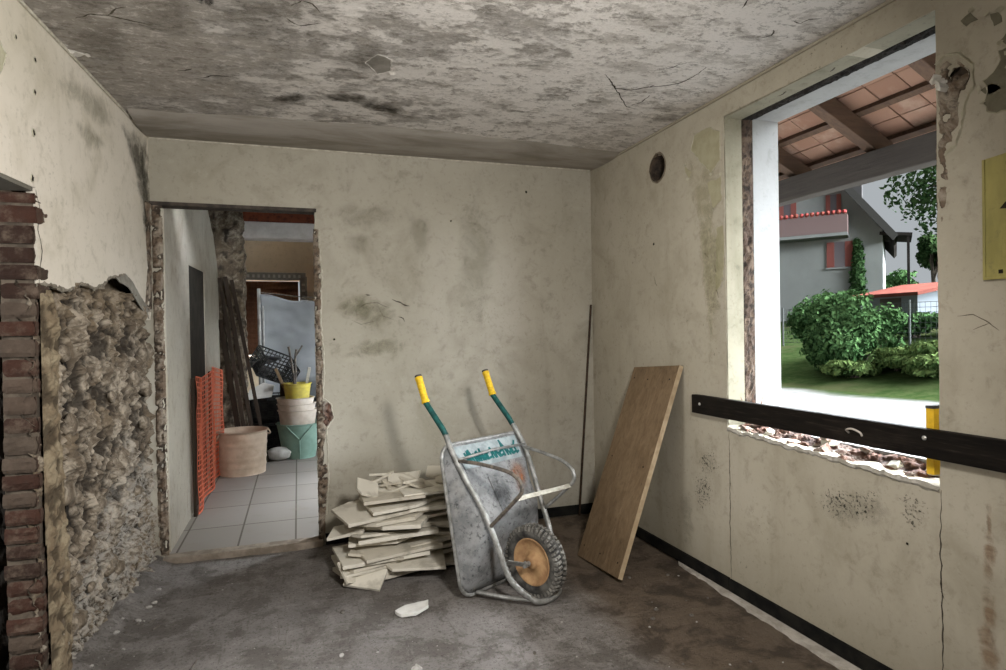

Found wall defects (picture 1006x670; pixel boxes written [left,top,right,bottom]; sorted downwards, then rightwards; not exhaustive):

damp [327,94,396,113]
spalling [741,26,935,404]
spalling [929,34,1006,221]
peeling [961,5,1004,26]
spalling [0,357,9,670]
spalling [15,202,170,670]
spalling [727,423,940,493]
damp [823,489,873,519]